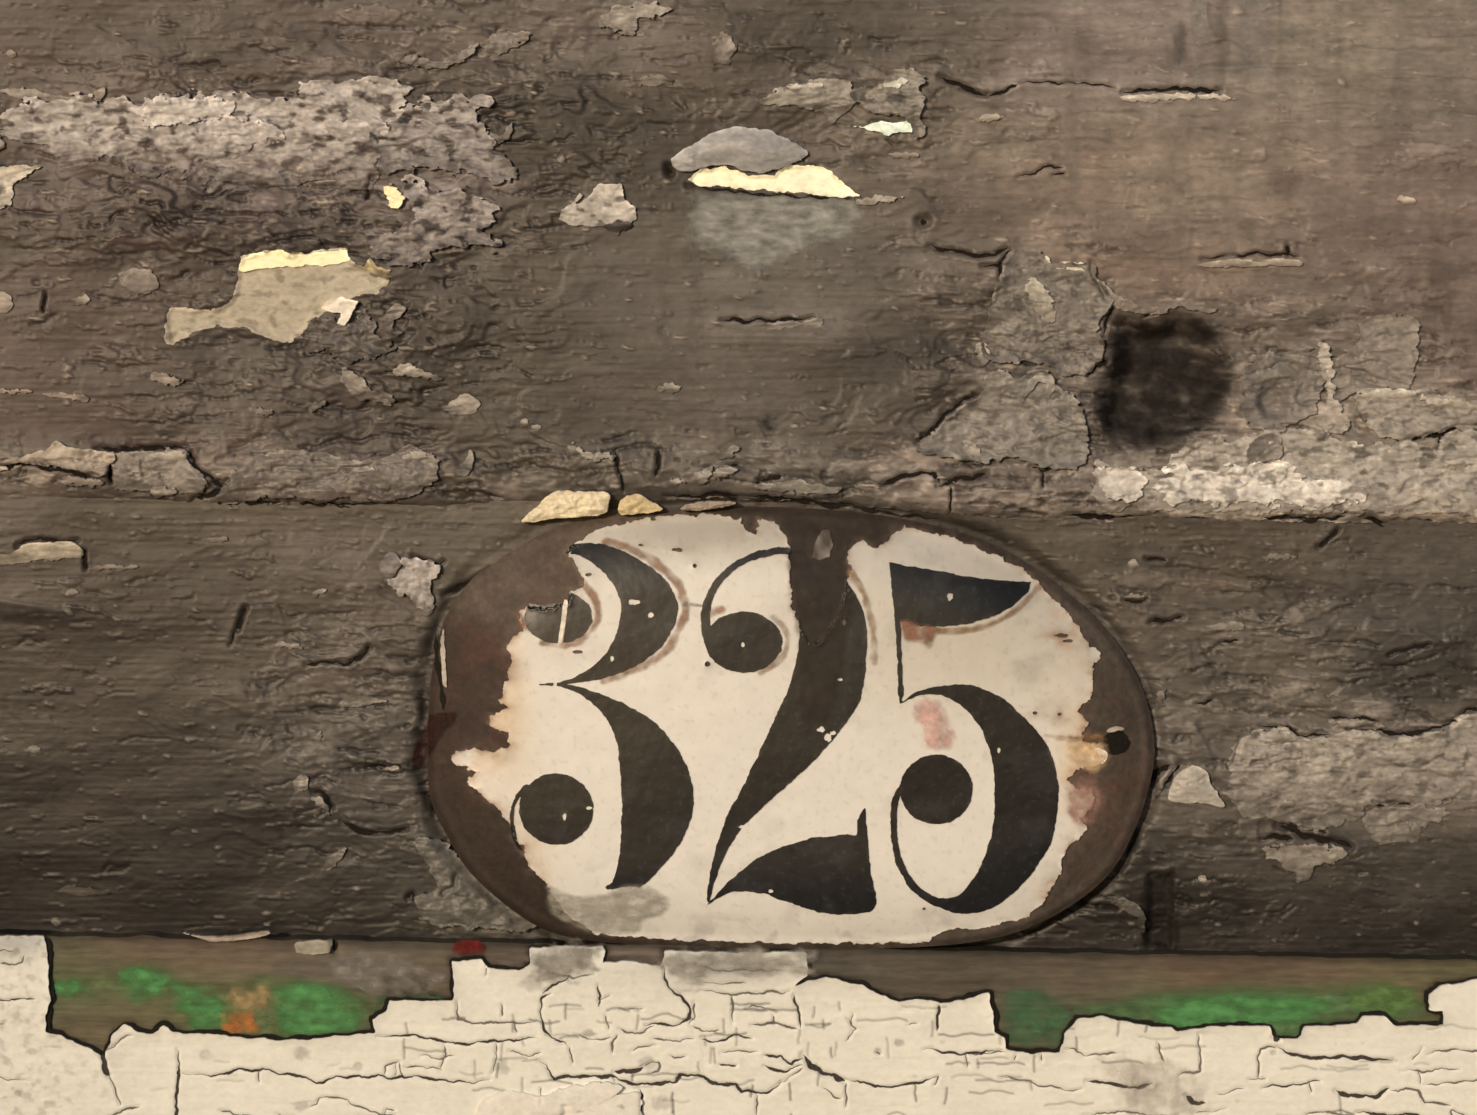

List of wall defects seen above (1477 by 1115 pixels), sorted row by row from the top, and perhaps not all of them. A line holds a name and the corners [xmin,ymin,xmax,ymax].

crack [940,77,1222,96]
peeling [0,29,531,406]
peeling [688,165,903,205]
peeling [915,249,1477,521]
rust [602,539,688,679]
rust [778,515,886,712]
rust [901,596,1029,644]
rust [1068,734,1104,824]
peeling [1151,711,1477,883]
crack [0,949,33,1025]
crack [101,1035,138,1115]
crack [174,965,1477,1115]